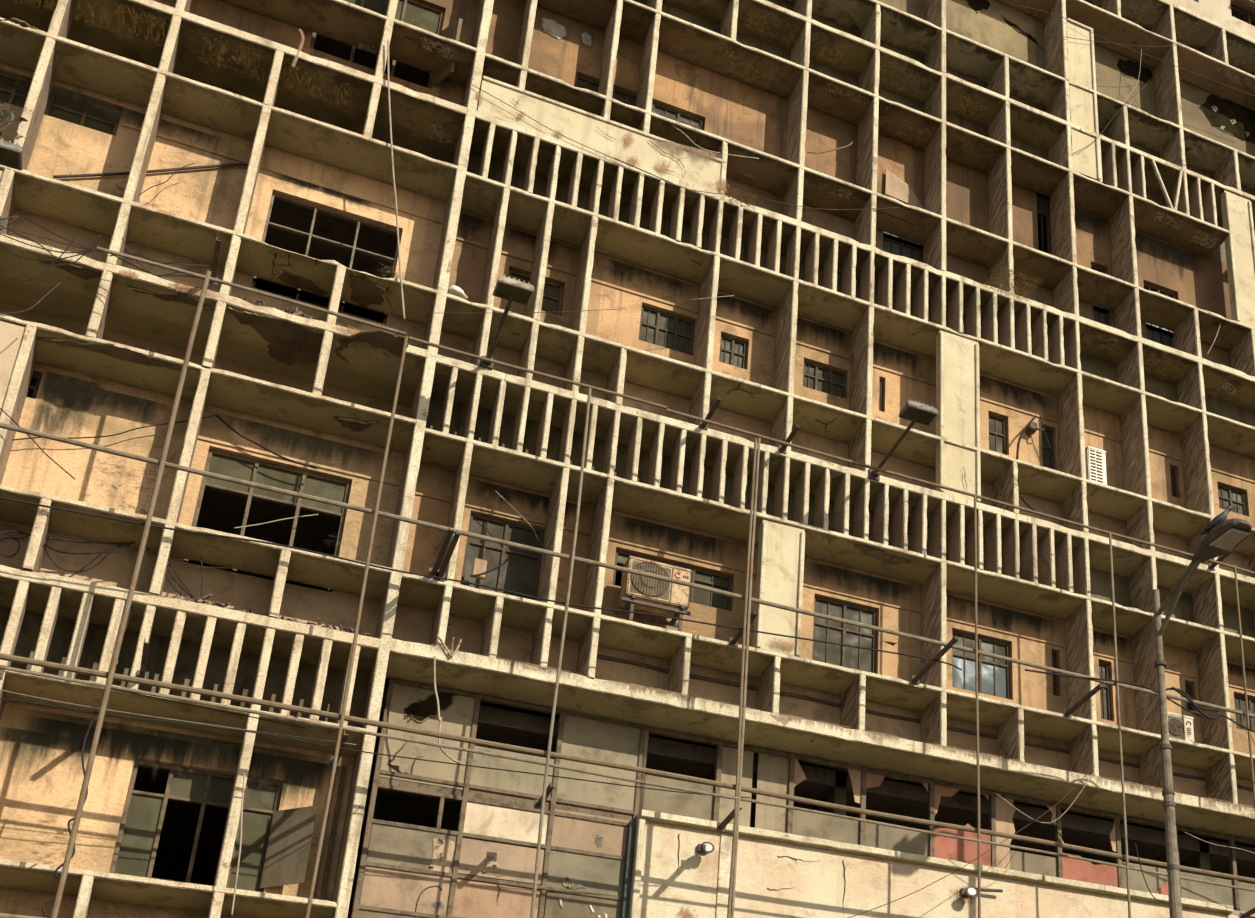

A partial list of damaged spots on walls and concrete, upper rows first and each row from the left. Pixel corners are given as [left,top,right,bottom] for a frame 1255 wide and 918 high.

peeling [1121,0,1163,27]
peeling [1216,41,1255,90]
leakage [37,372,158,428]
leakage [624,517,724,553]
leakage [7,712,329,795]